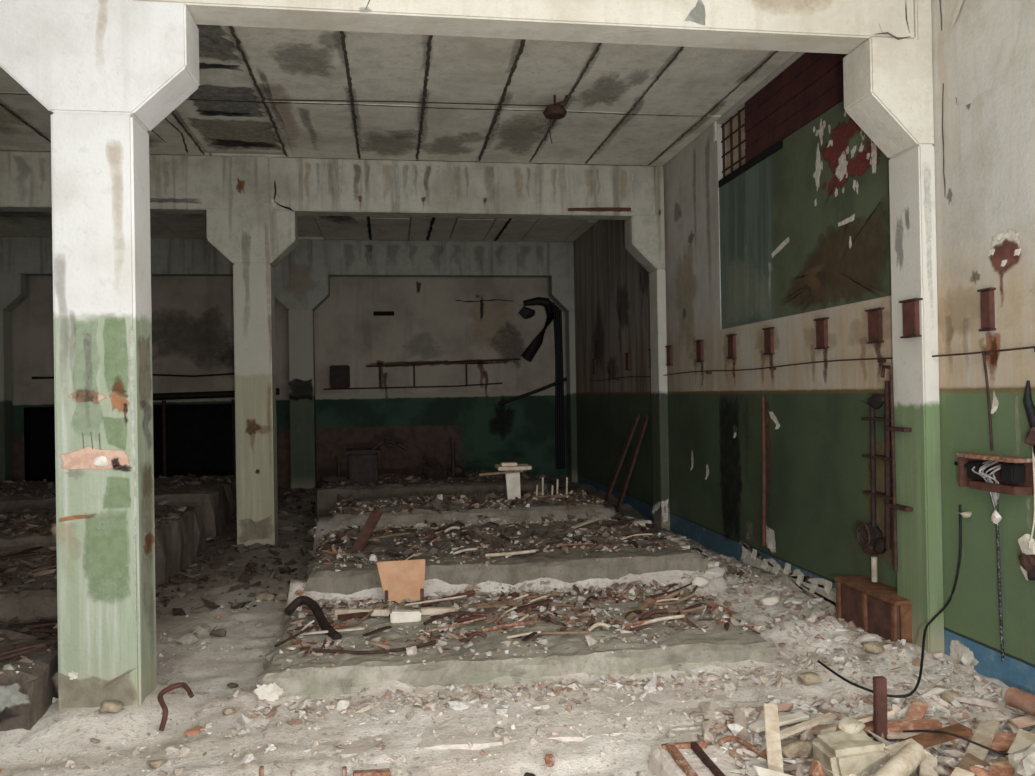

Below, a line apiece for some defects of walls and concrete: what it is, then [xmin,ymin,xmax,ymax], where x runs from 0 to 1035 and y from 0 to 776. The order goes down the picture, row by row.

peeling [813,111,880,207]
peeling [60,319,136,599]
rust [246,420,260,435]